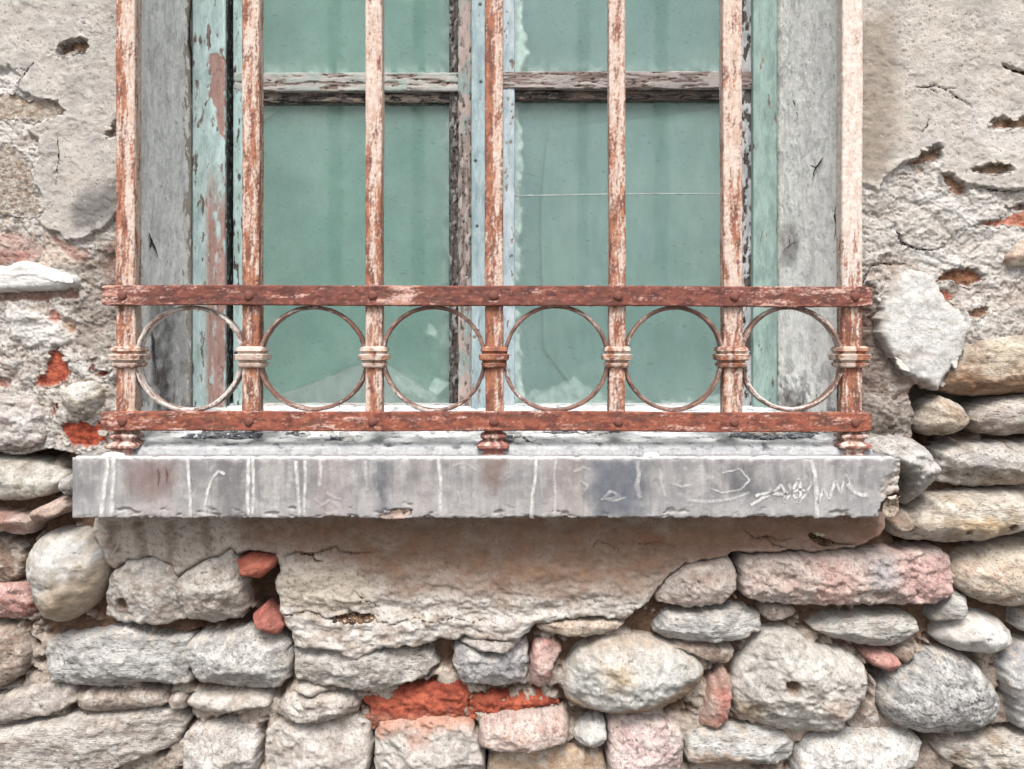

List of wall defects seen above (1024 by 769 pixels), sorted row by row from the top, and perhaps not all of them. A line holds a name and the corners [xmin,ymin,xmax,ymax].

spalling [57,37,89,57]
flaking render [0,91,65,124]
flaking render [104,124,116,138]
flaking render [987,116,1024,131]
flaking render [0,143,43,220]
flaking render [905,145,1013,198]
flaking render [973,203,1024,229]
flaking render [936,267,985,304]
flaking render [968,304,990,321]
flaking render [88,354,113,379]
flaking render [32,347,108,451]